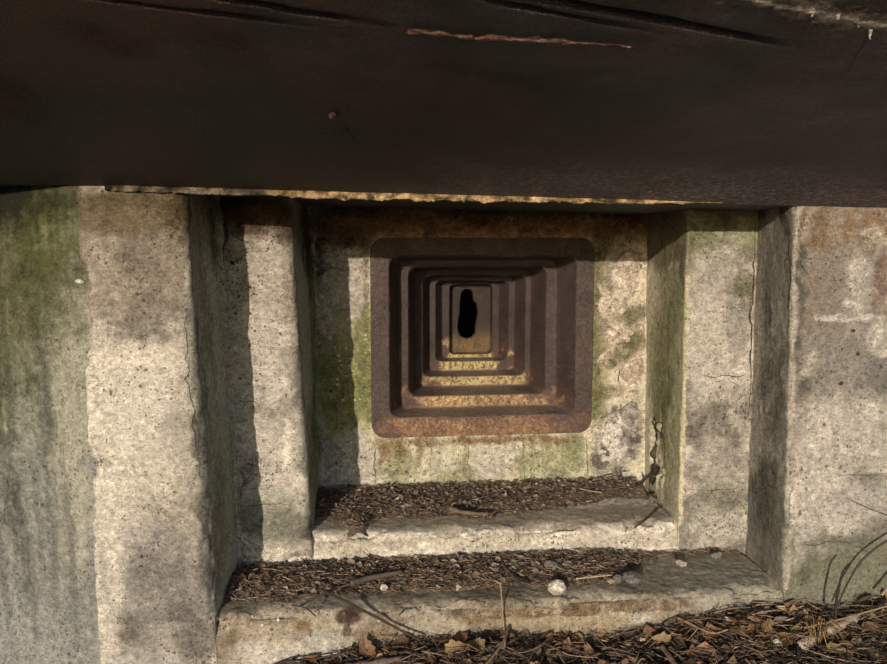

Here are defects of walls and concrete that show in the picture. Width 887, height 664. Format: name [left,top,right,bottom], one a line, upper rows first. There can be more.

damp [751,0,887,40]
crack [184,314,200,475]
crack [703,227,756,422]
crack [784,223,809,324]